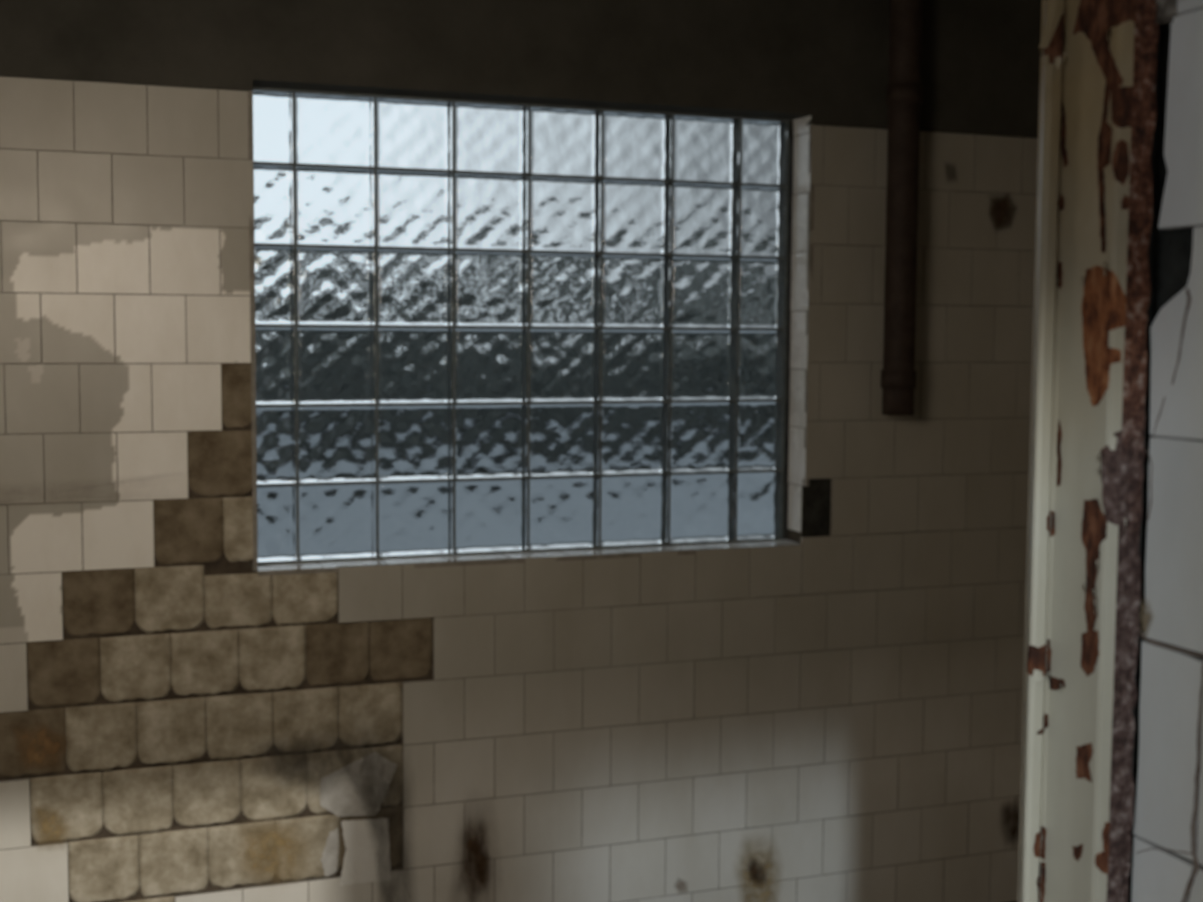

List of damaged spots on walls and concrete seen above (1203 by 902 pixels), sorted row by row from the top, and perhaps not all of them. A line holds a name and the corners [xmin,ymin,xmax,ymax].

peeling [1039,0,1068,69]
spalling [1156,0,1179,24]
crack [1147,288,1191,520]
spalling [0,363,433,902]
rust [1081,429,1126,676]
crack [1137,628,1203,902]